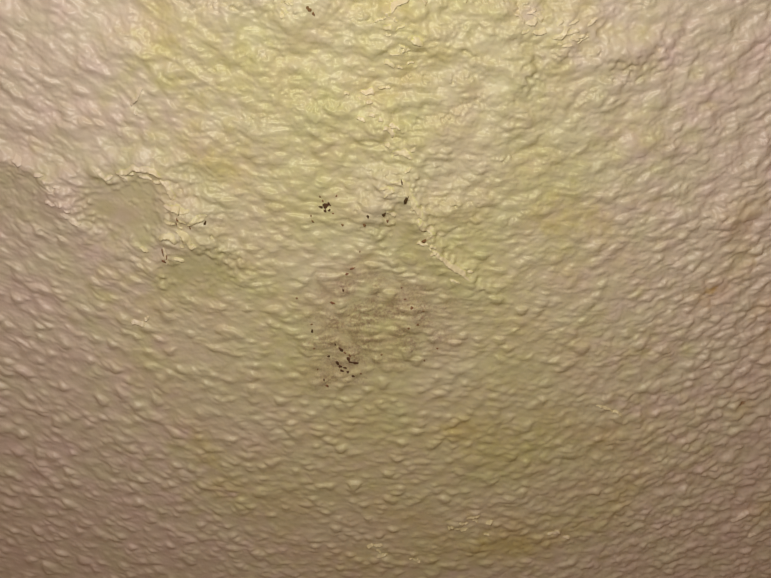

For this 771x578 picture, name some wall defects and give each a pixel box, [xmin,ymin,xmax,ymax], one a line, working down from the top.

peeling [384,35,424,70]
peeling [344,85,474,285]
leakage [327,343,362,377]